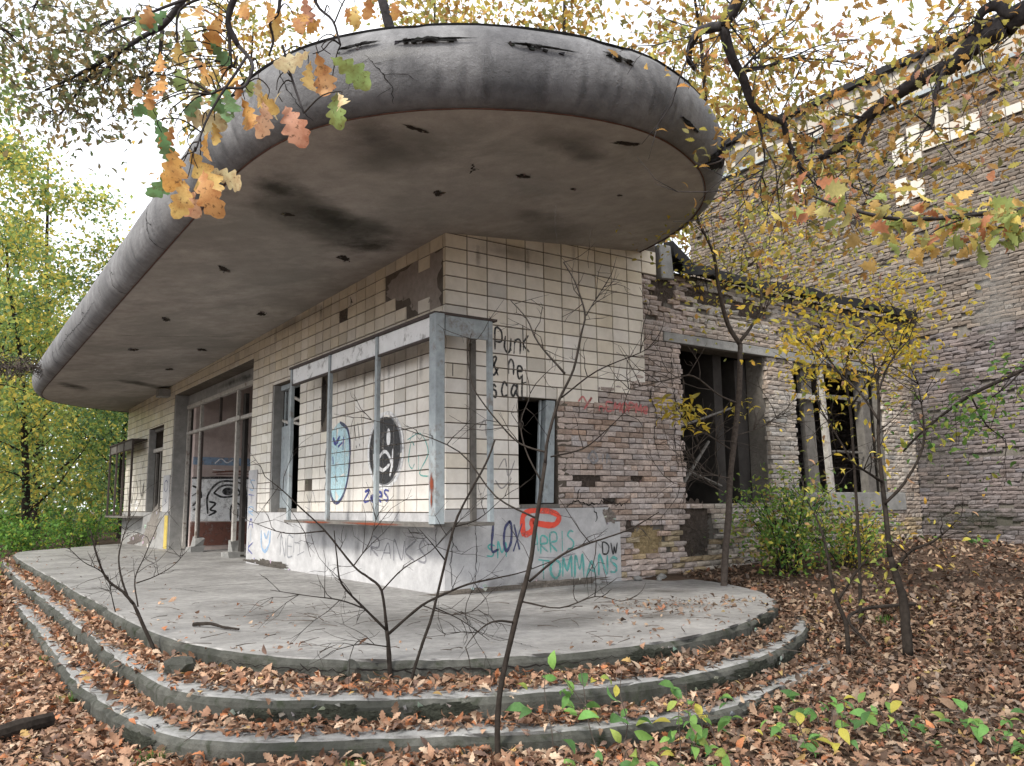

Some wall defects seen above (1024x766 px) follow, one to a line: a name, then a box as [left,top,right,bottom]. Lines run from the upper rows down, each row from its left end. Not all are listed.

spalling [394,36,471,45]
spalling [502,41,577,55]
spalling [603,51,634,66]
peeling [386,249,443,313]
spalling [572,475,662,559]